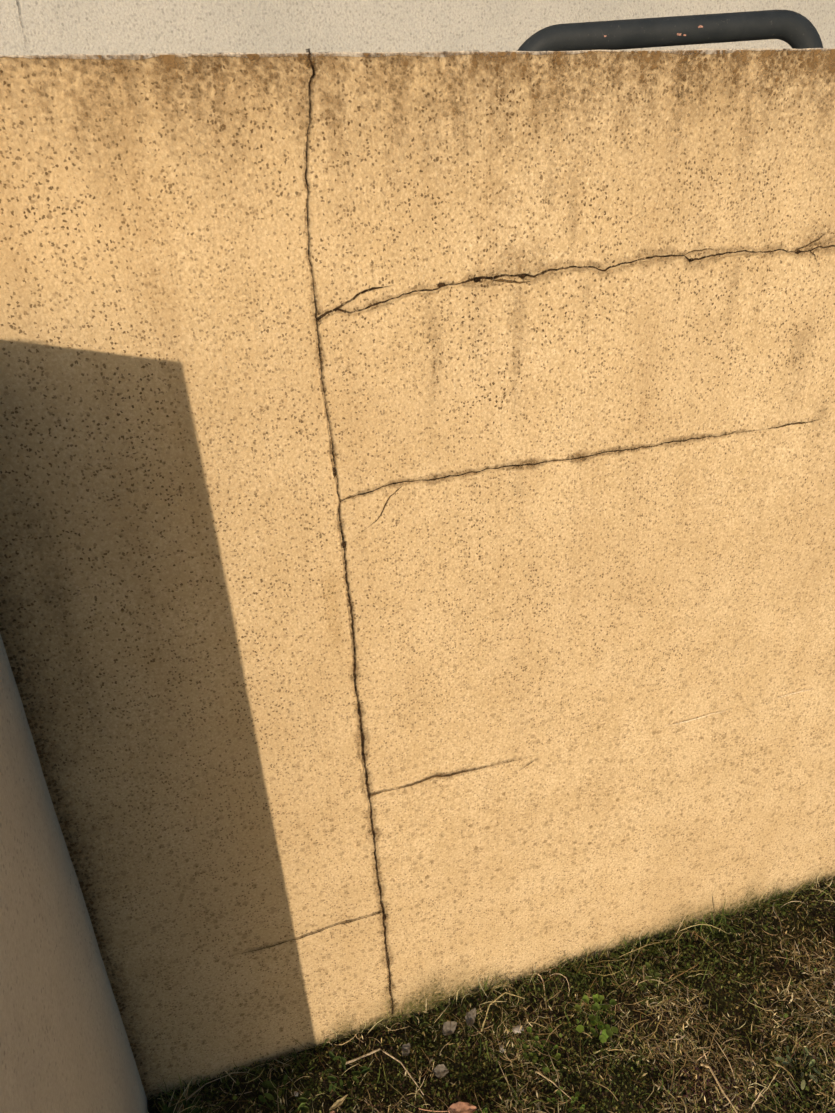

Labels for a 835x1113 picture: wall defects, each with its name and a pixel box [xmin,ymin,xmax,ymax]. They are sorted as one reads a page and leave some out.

water stain [0,53,348,119]
water stain [363,49,835,115]
crack [267,48,835,1022]